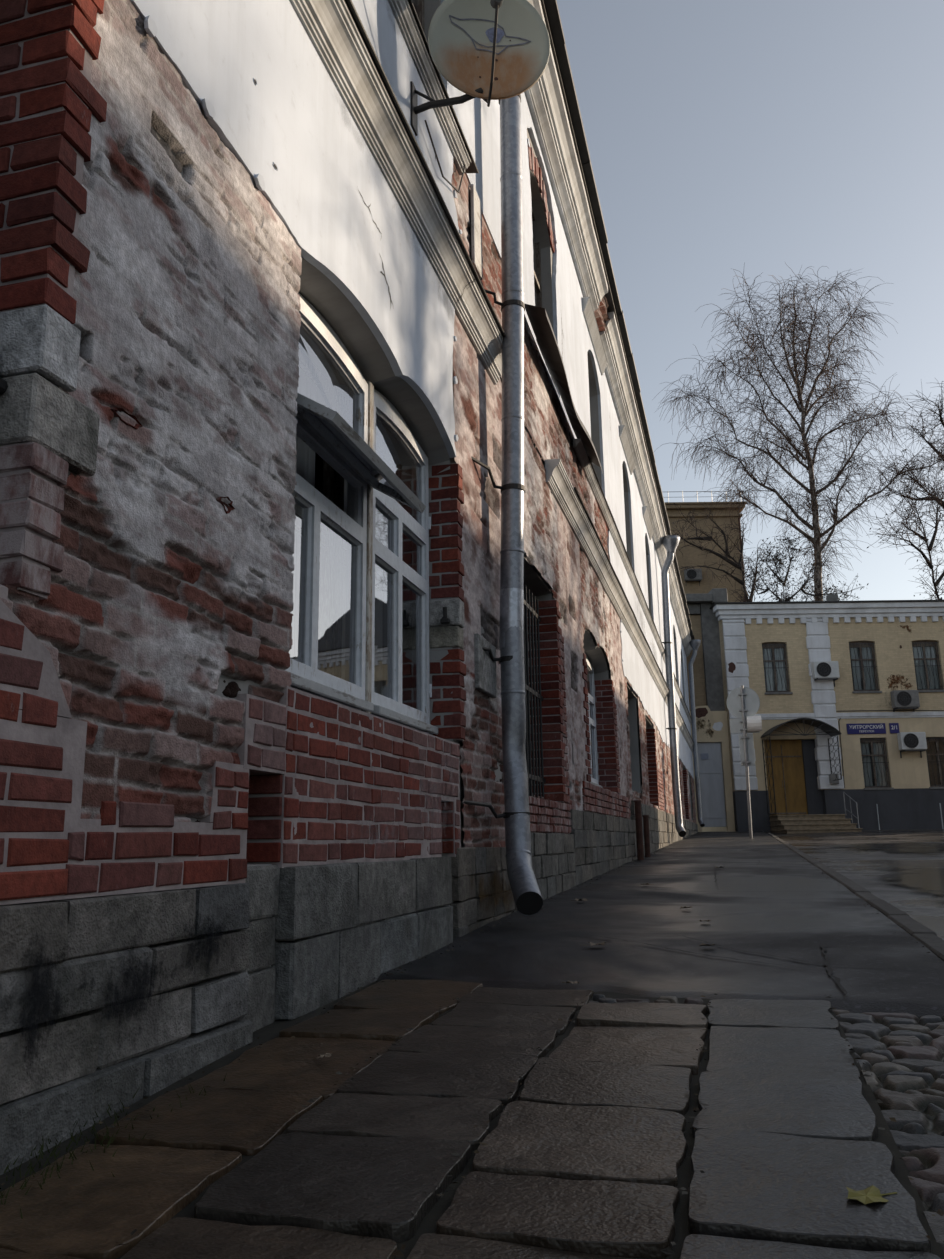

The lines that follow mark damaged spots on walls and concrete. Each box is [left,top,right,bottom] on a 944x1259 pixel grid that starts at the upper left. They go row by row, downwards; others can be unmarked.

peeling [0,0,302,822]
peeling [451,161,502,326]
peeling [453,313,506,847]
peeling [524,318,697,834]
water stain [4,935,65,1069]
water stain [80,940,173,1038]